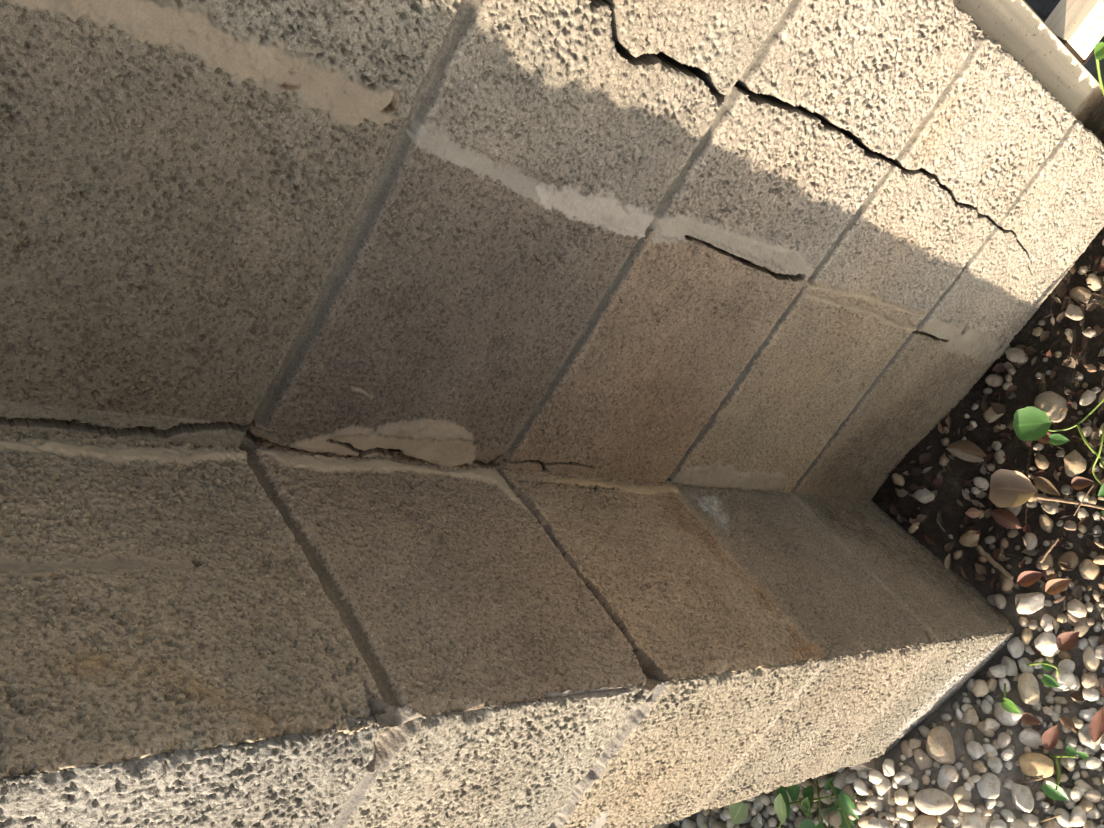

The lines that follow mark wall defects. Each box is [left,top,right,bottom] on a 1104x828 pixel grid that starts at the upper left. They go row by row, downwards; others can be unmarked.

spalling [379,91,400,113]
crack [589,0,1033,282]